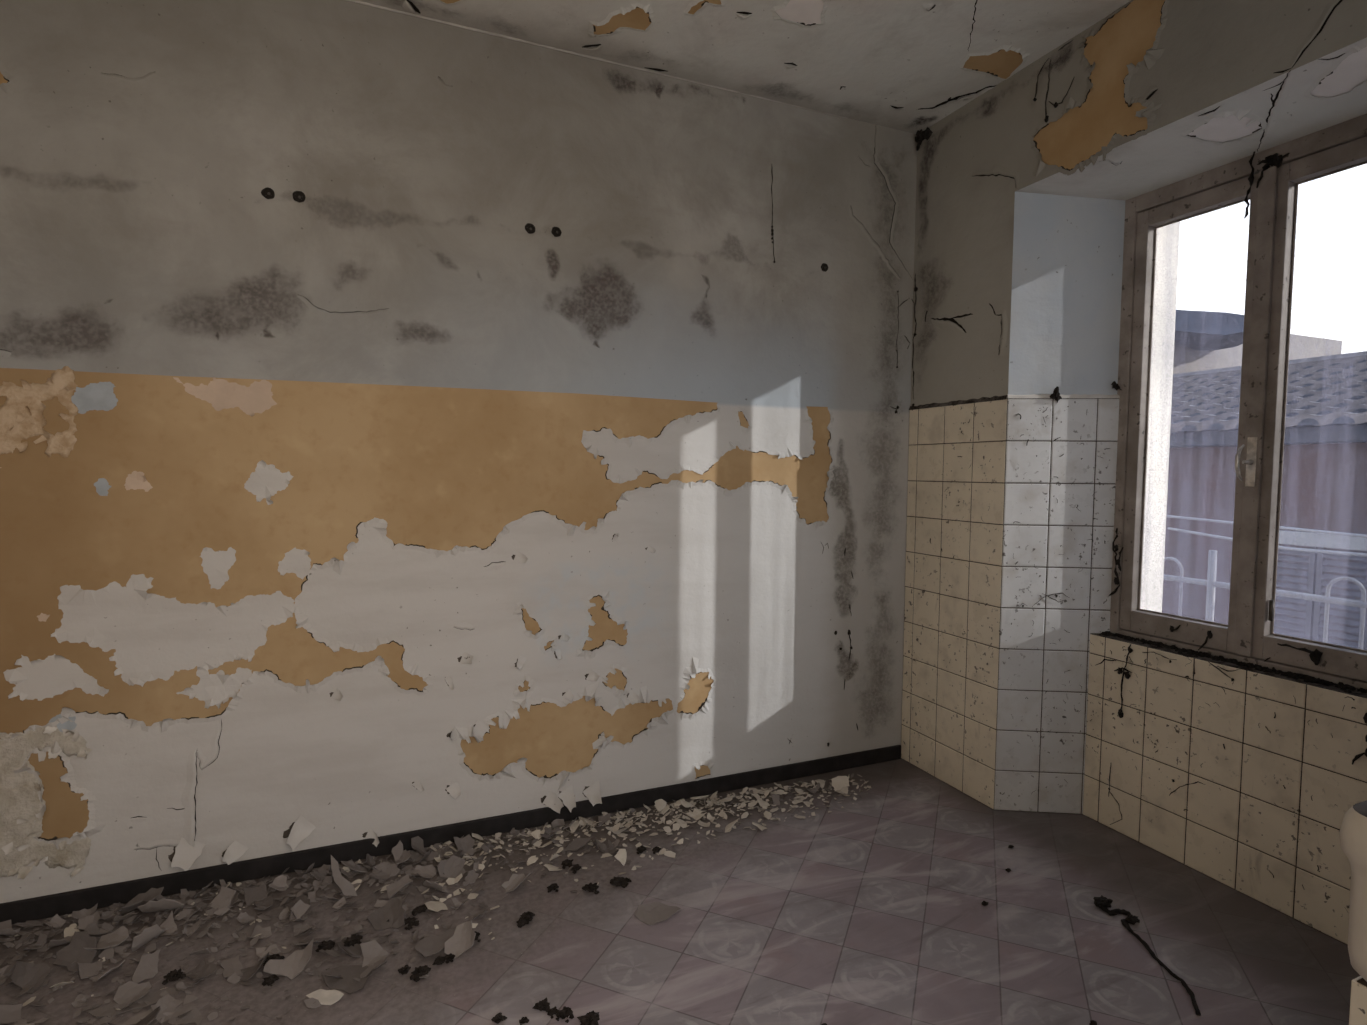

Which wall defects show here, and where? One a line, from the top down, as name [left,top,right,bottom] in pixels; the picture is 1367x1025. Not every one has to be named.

peeling [587,3,656,38]
peeling [959,45,1031,80]
peeling [1030,0,1170,178]
peeling [1180,109,1267,145]
crack [1257,0,1346,152]
peeling [1304,41,1367,100]
mould [561,267,631,347]
peeling [0,368,835,879]